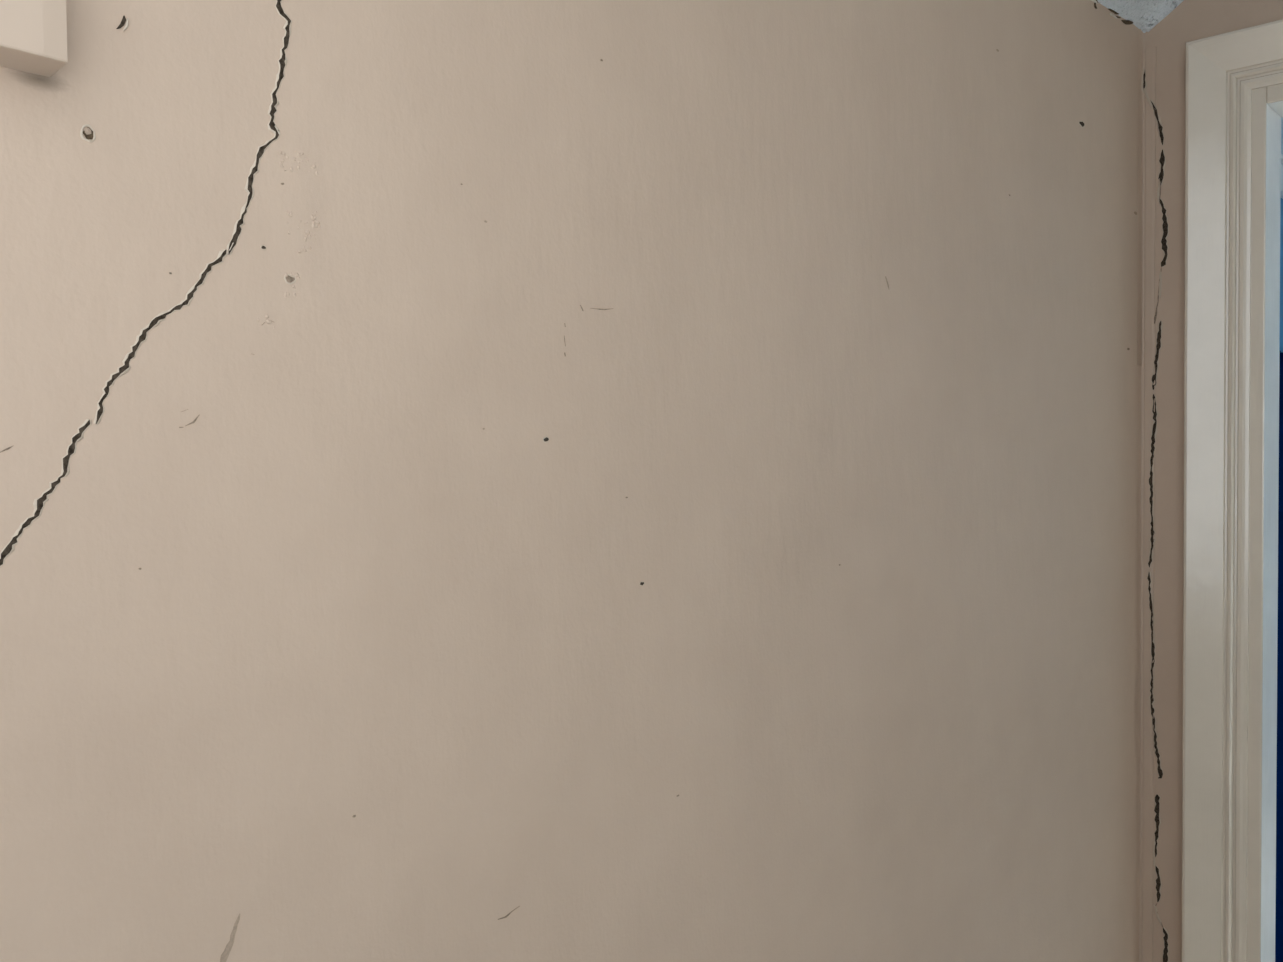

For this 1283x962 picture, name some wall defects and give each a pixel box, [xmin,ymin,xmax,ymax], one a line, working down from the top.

crack [0,0,292,567]
crack [1141,69,1169,962]